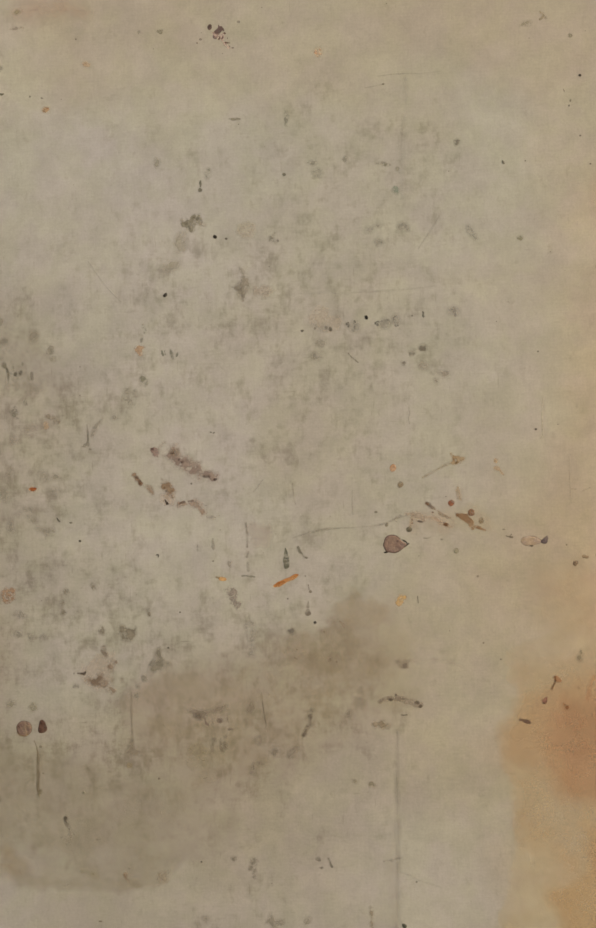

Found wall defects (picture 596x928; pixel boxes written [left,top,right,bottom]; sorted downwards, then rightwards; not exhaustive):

damp [80,651,117,693]